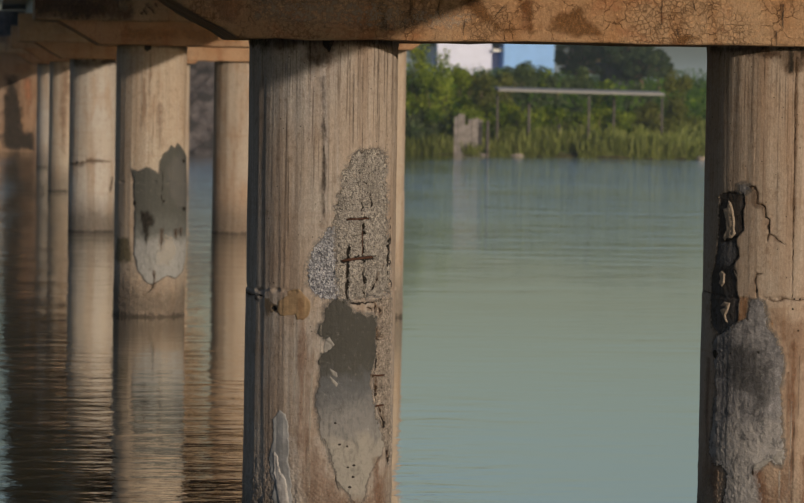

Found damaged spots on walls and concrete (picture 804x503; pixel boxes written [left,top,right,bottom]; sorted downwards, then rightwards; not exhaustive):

spalling [264,148,393,464]
peeling [710,192,745,333]
crack [736,58,804,310]